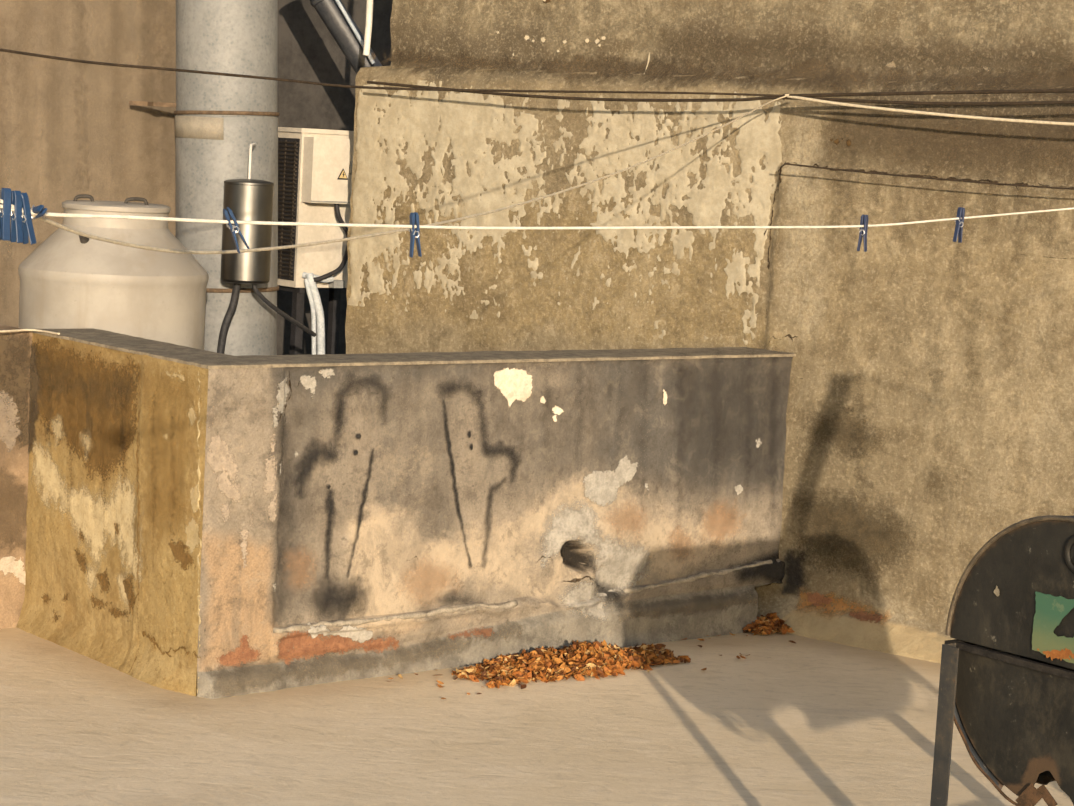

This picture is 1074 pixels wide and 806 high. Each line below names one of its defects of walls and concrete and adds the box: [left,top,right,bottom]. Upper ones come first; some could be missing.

peeling [348,80,782,345]
spalling [494,368,564,422]
flaking render [583,455,639,506]
water stain [75,528,135,622]
water stain [738,493,912,594]